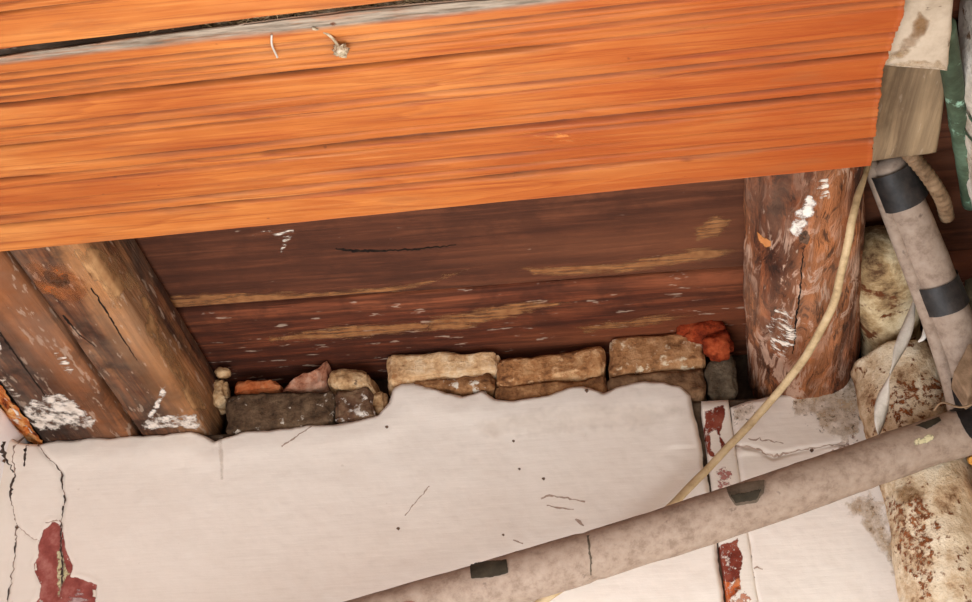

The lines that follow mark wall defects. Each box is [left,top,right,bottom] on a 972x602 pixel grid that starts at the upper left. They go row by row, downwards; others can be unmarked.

rust [867,373,946,433]
crack [735,437,845,458]
crack [0,437,66,601]
peeling [34,522,97,602]
rust [884,488,942,602]